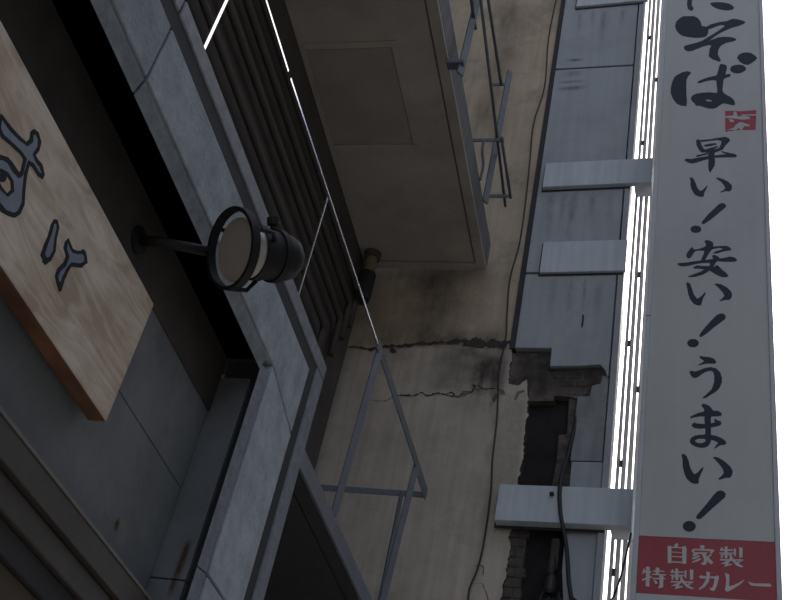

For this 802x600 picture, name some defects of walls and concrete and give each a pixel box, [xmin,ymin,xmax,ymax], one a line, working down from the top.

crack [347,337,510,353]
crack [373,384,502,401]
spalling [492,352,610,487]
spalling [502,529,531,600]